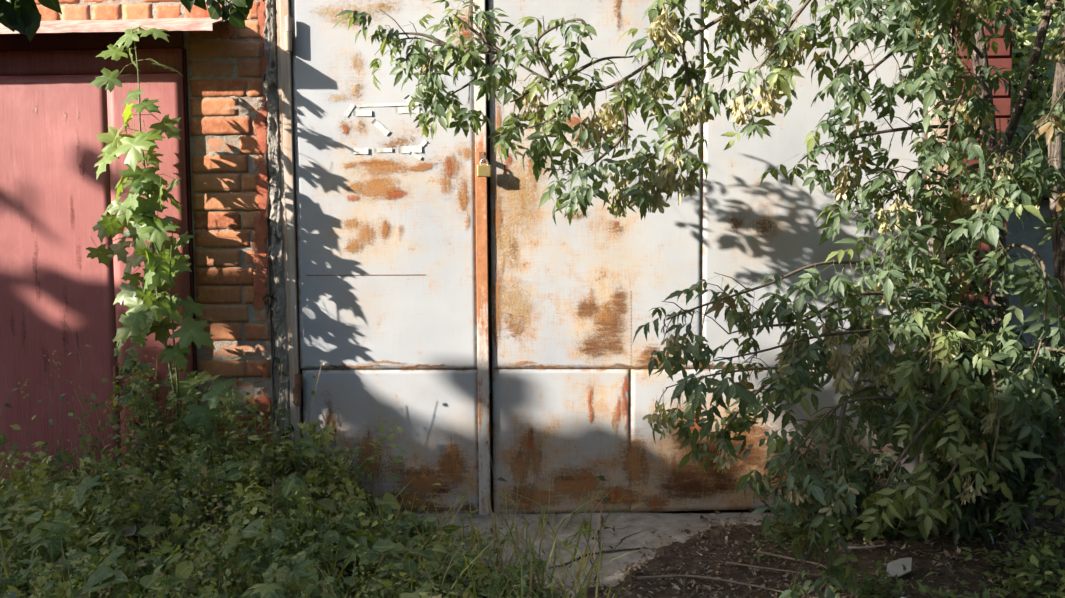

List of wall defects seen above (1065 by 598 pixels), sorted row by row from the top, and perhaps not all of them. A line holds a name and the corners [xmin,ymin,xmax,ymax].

corrosion [345,136,472,228]
corrosion [345,219,403,252]
corrosion [578,289,663,434]
corrosion [330,436,476,513]
corrosion [511,413,807,510]